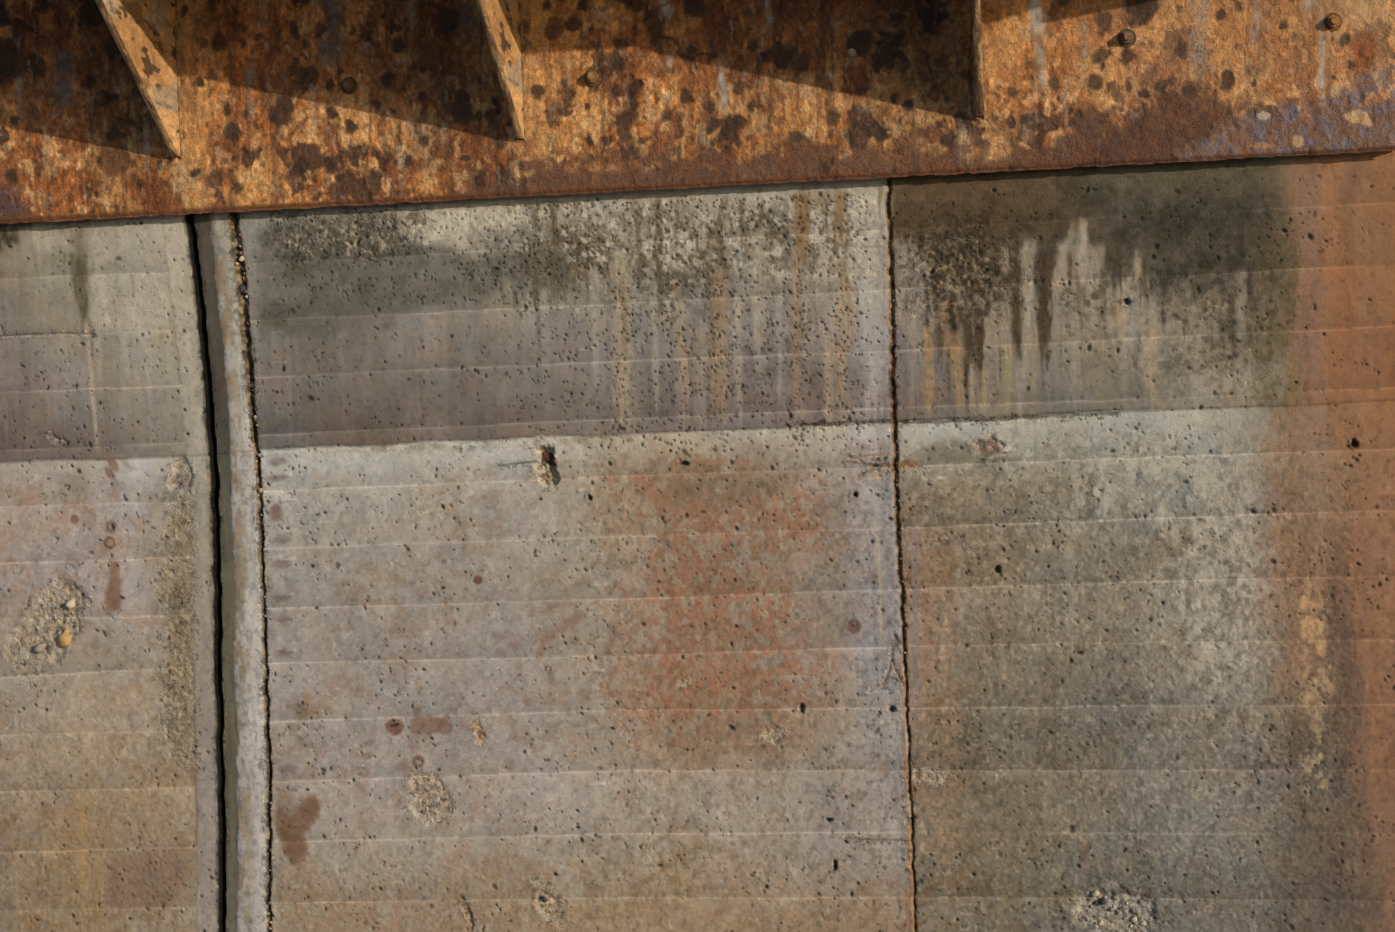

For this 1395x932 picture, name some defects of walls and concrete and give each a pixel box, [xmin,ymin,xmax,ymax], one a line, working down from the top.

rust [262,89,299,131]
rust [1119,0,1167,32]
rust [1054,82,1241,168]
leakage [246,182,791,392]
spalling [2,560,95,695]
leakage [0,215,183,618]
spalling [526,430,563,496]
rust [271,523,970,932]
leakage [843,480,909,764]
crack [794,177,1123,932]
leakage [912,215,1395,932]
spalling [1055,876,1173,932]